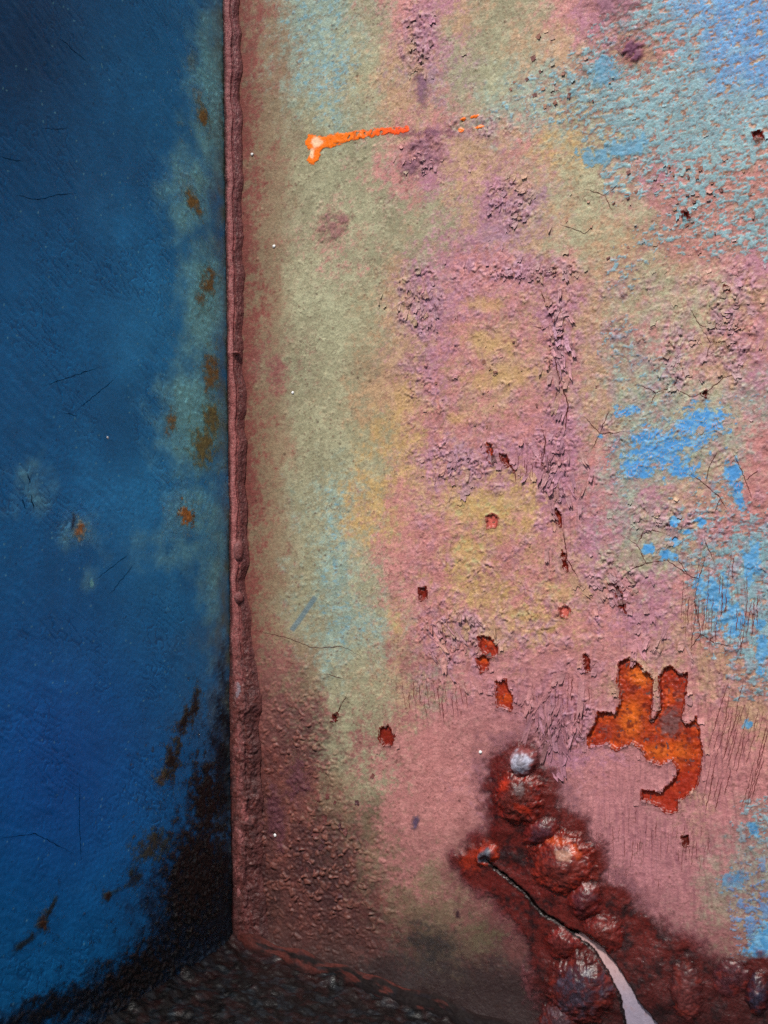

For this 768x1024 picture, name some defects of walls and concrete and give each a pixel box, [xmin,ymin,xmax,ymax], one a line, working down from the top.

corrosion [178,171,205,224]
corrosion [165,346,224,468]
peeling [419,249,766,532]
corrosion [166,481,204,535]
peeling [418,586,428,602]
peeling [424,498,710,815]
peeling [686,536,768,681]
corrosion [152,688,202,786]
peeling [375,723,400,754]
corrosion [103,827,173,902]
corrosion [447,724,768,1024]
crack [495,867,658,1024]